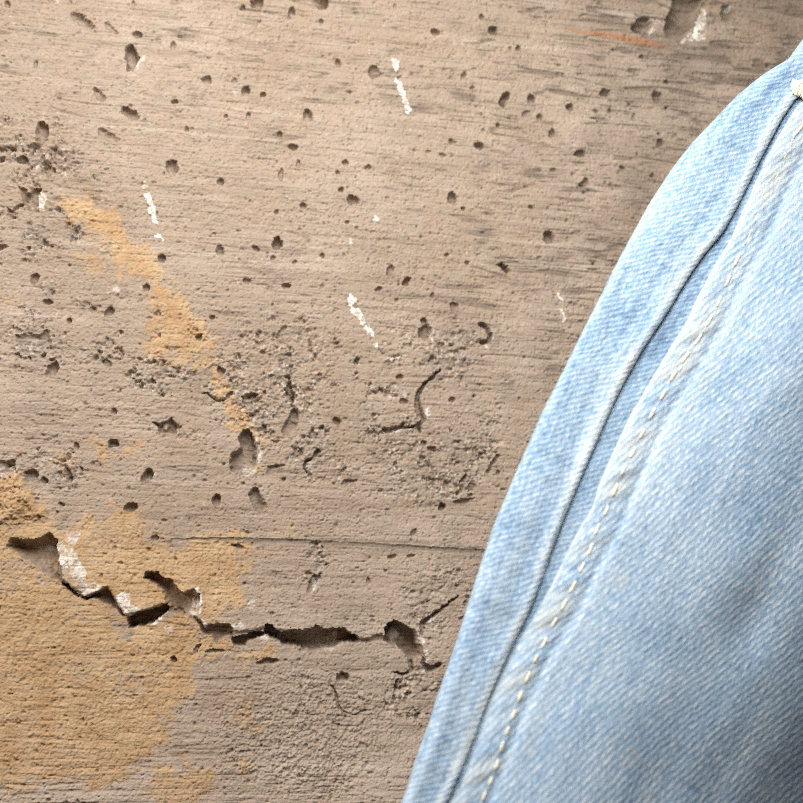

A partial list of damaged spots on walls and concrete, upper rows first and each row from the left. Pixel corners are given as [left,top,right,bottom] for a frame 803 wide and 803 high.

crack [382,368,441,435]
crack [6,532,459,702]
crack [330,684,368,716]